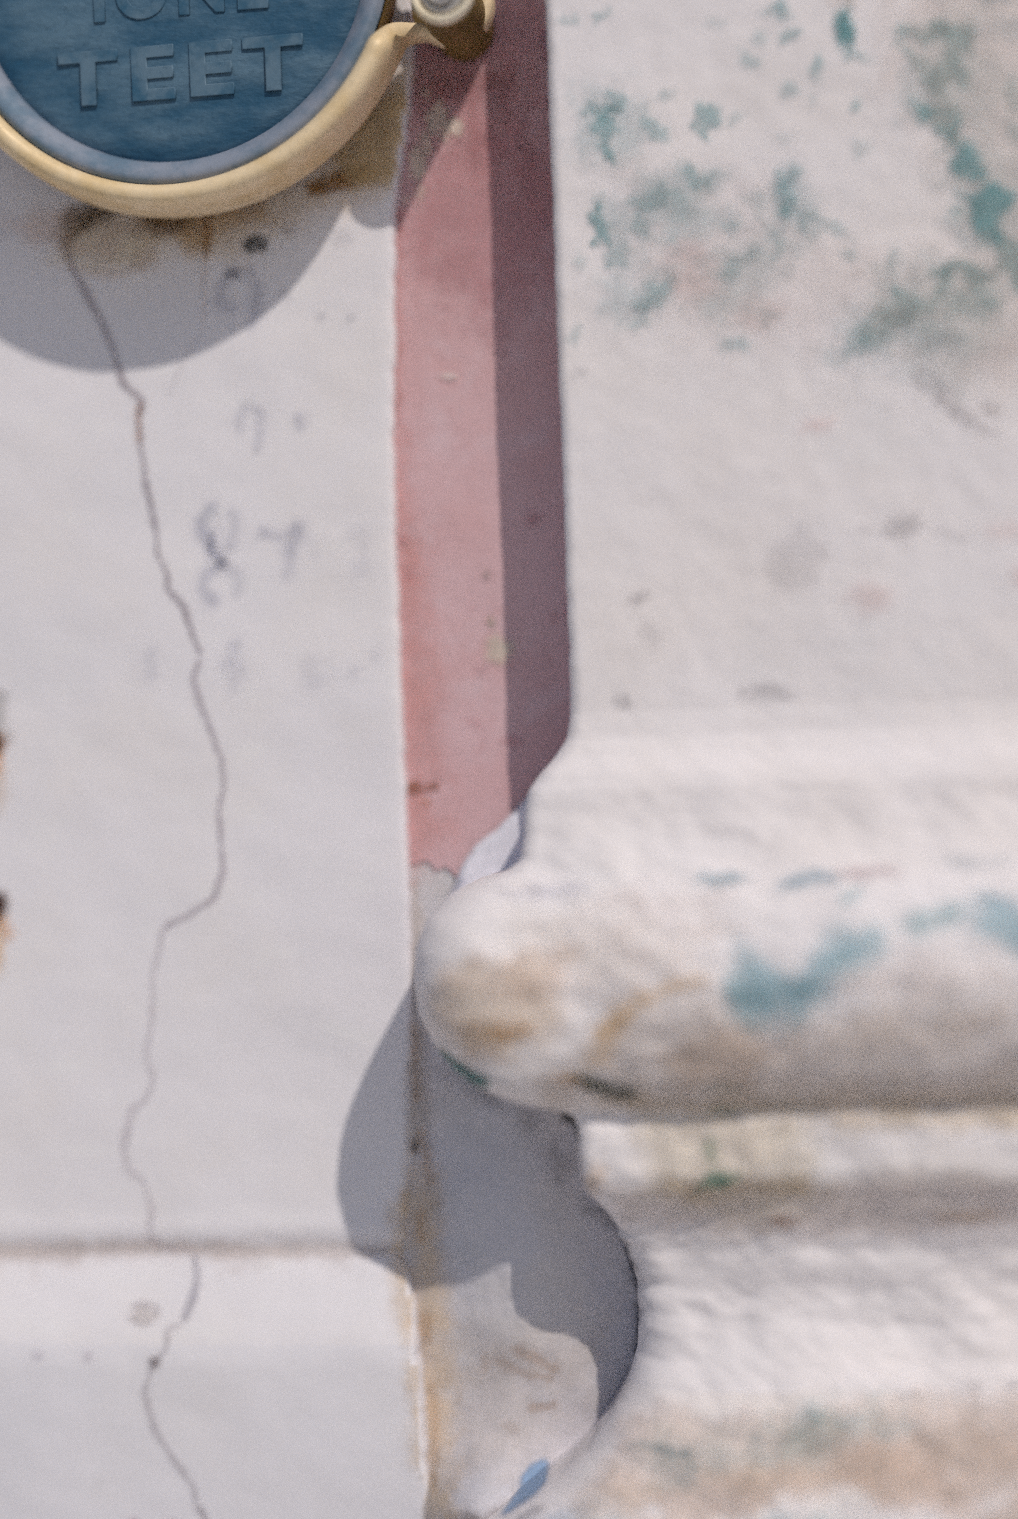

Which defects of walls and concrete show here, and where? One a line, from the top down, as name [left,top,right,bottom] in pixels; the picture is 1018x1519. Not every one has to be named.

leakage [308,92,407,195]
leakage [66,208,113,236]